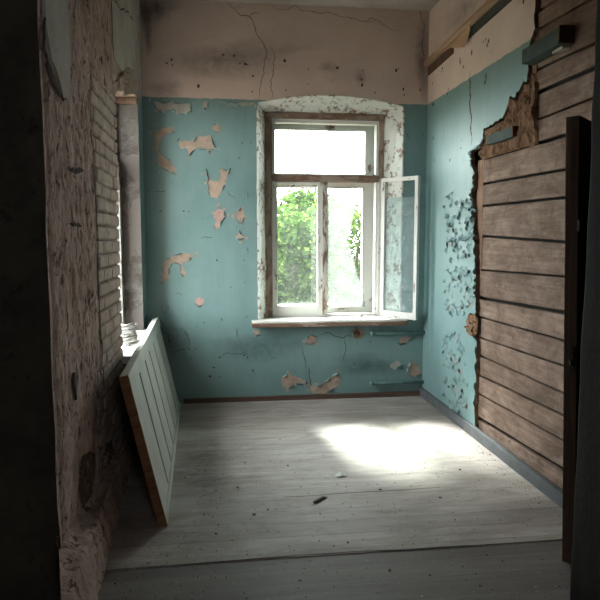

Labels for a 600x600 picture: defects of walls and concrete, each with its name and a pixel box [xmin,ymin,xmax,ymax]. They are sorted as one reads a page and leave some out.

crack [227,3,400,99]
peeling [179,123,221,160]
crack [466,77,474,143]
peeling [201,165,248,250]
peeling [159,252,197,284]
flaking render [441,72,539,415]
peeling [281,370,340,394]